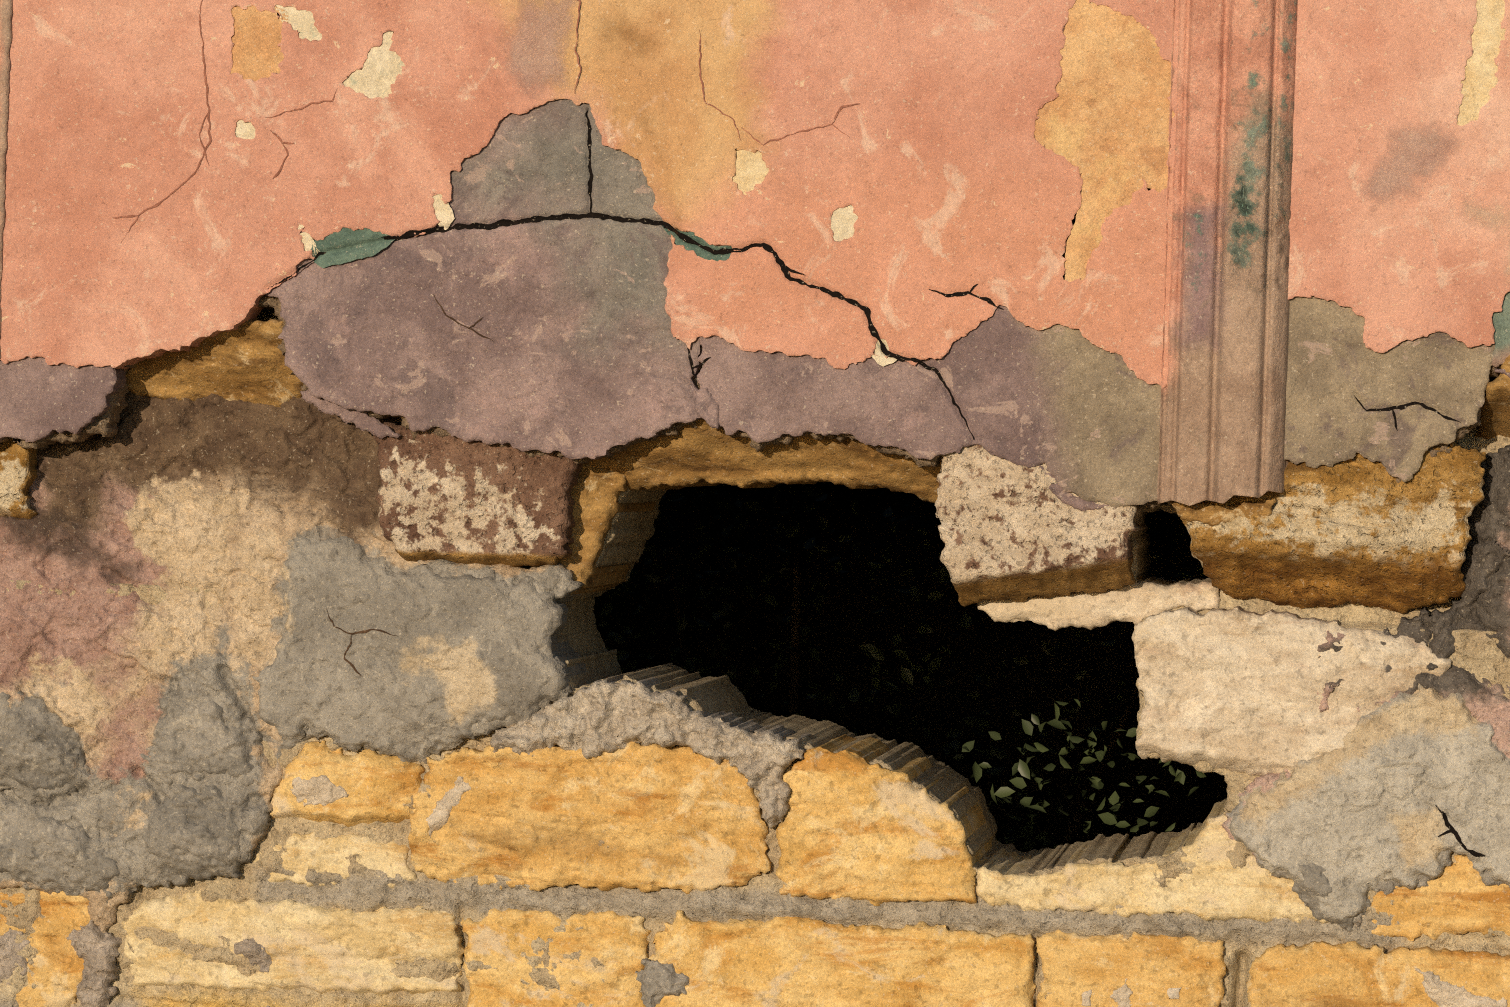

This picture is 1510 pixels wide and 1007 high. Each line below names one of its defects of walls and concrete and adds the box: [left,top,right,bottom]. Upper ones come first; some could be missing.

peeling [230,5,322,81]
peeling [343,31,405,99]
peeling [1457,0,1506,126]
peeling [1034,0,1175,282]
crack [268,252,326,289]
crack [381,0,974,440]
crack [929,284,1003,309]
spalling [0,99,1291,933]